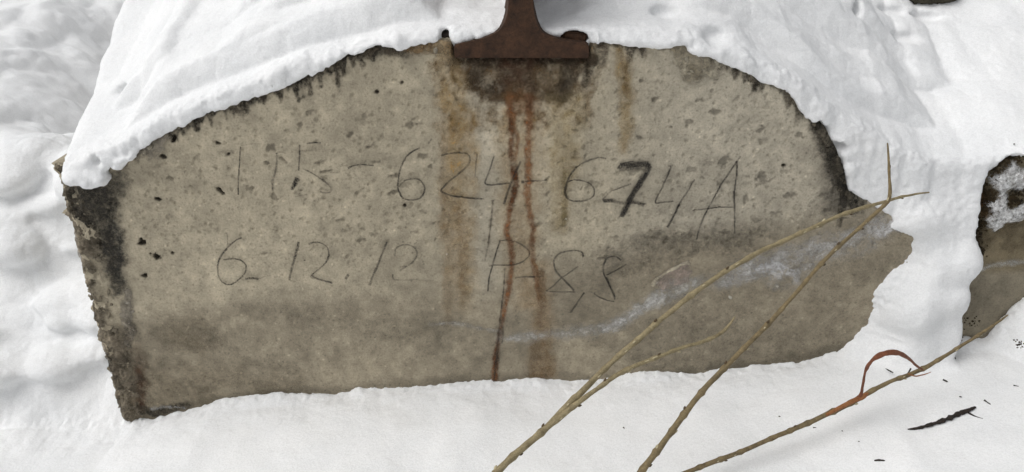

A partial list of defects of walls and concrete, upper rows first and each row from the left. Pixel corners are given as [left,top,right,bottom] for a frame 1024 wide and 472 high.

corrosion [450,61,594,381]
leakage [449,42,597,104]